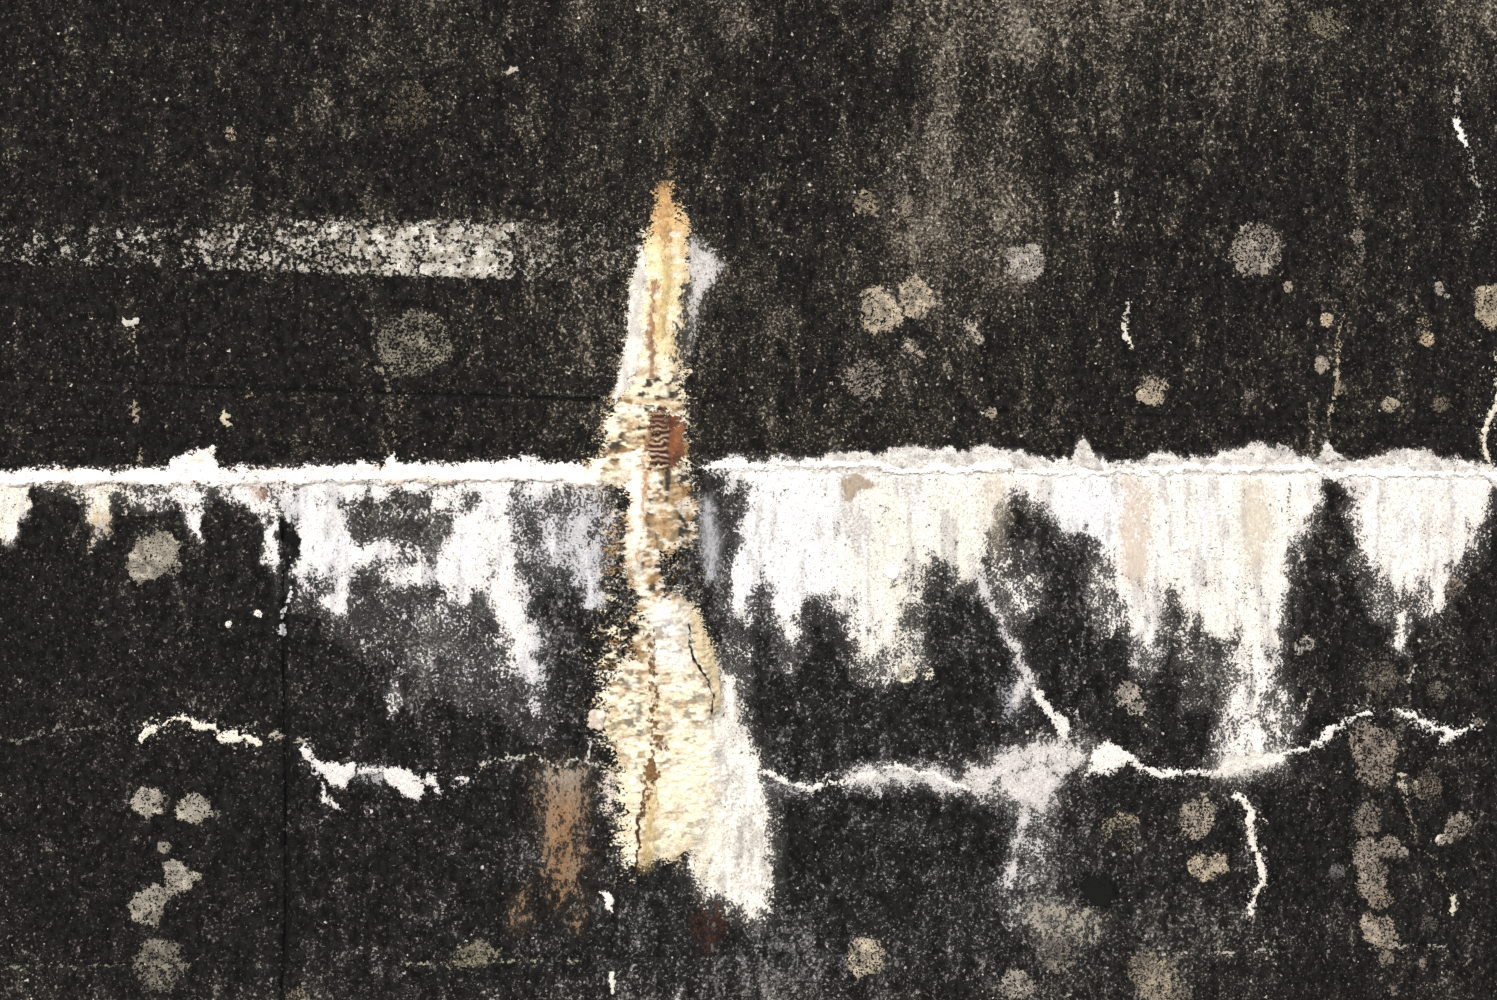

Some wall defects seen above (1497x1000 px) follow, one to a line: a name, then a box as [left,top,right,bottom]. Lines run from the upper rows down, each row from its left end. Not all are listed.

crack [122,316,139,353]
crack [130,400,143,467]
water stain [0,138,1497,932]
crack [1476,351,1497,468]
crack [0,510,606,1000]
crack [744,554,1485,957]